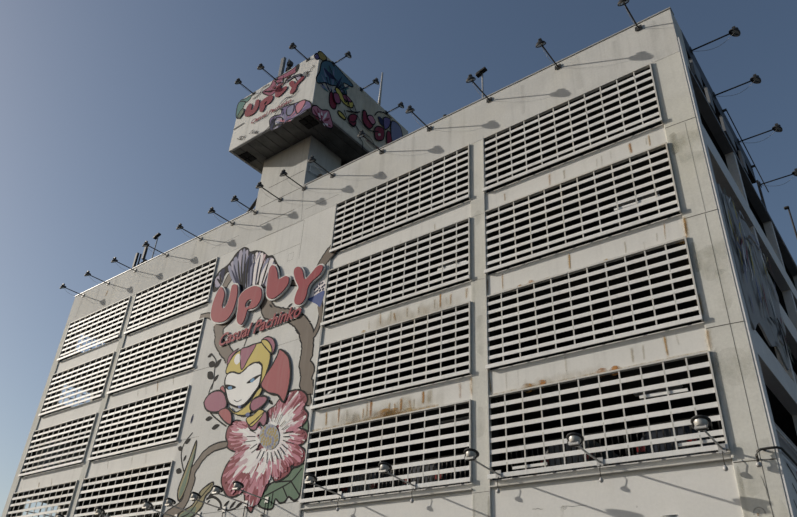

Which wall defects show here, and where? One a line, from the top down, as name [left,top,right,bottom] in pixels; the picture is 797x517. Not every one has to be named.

corrosion [369,392,435,420]